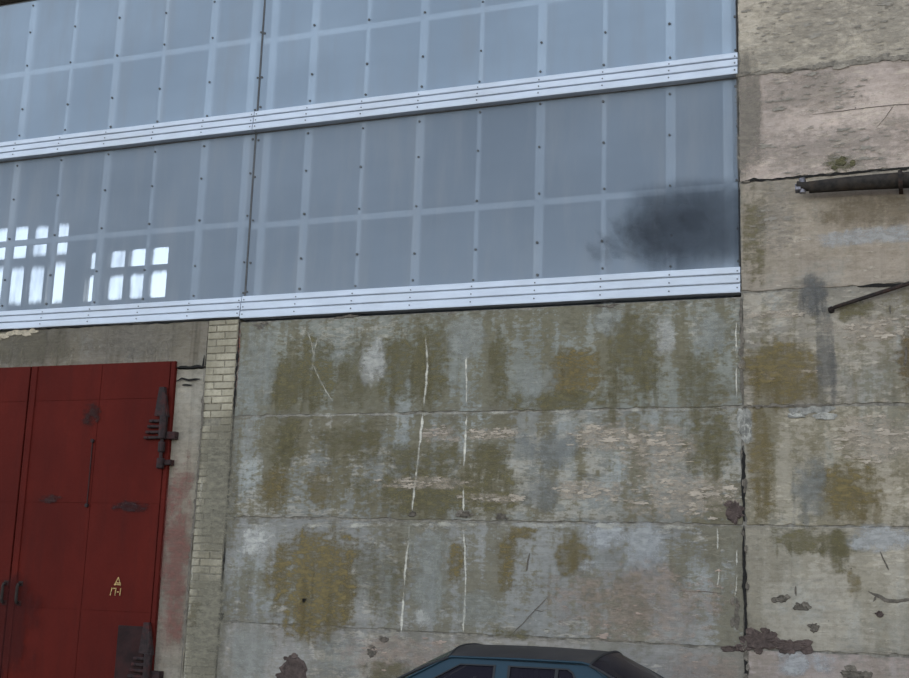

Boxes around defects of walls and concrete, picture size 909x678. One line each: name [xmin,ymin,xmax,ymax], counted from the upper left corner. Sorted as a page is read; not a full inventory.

spalling [0,328,38,341]
leakage [362,340,384,378]
leakage [412,415,424,509]
leakage [242,526,275,555]
leakage [587,523,668,568]
leakage [404,534,440,624]
spalling [771,594,812,611]
spalling [720,597,820,678]
spalling [275,653,308,678]
spalling [840,665,873,678]